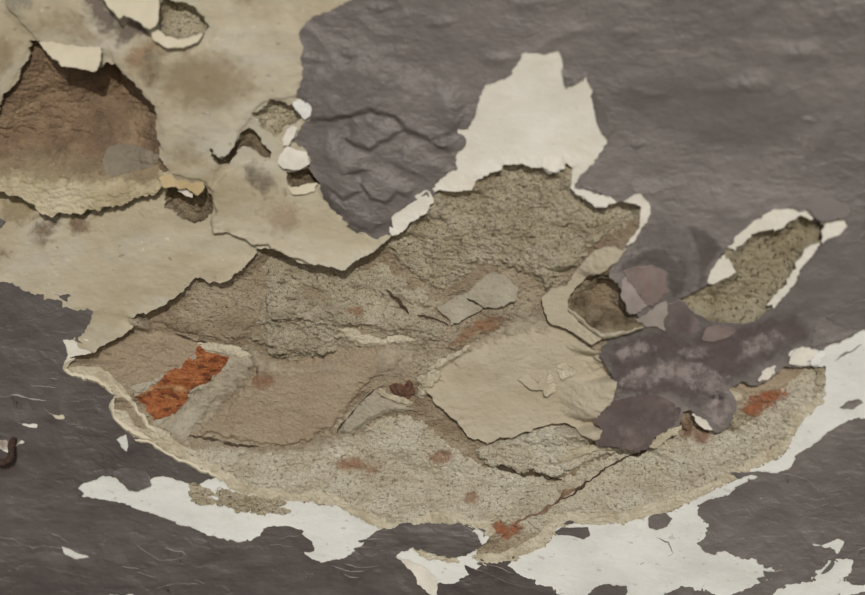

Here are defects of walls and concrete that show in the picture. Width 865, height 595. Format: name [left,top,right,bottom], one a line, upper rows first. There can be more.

flaking render [0,0,434,359]
peeling [433,46,616,207]
spalling [62,163,865,595]
crack [483,448,649,524]